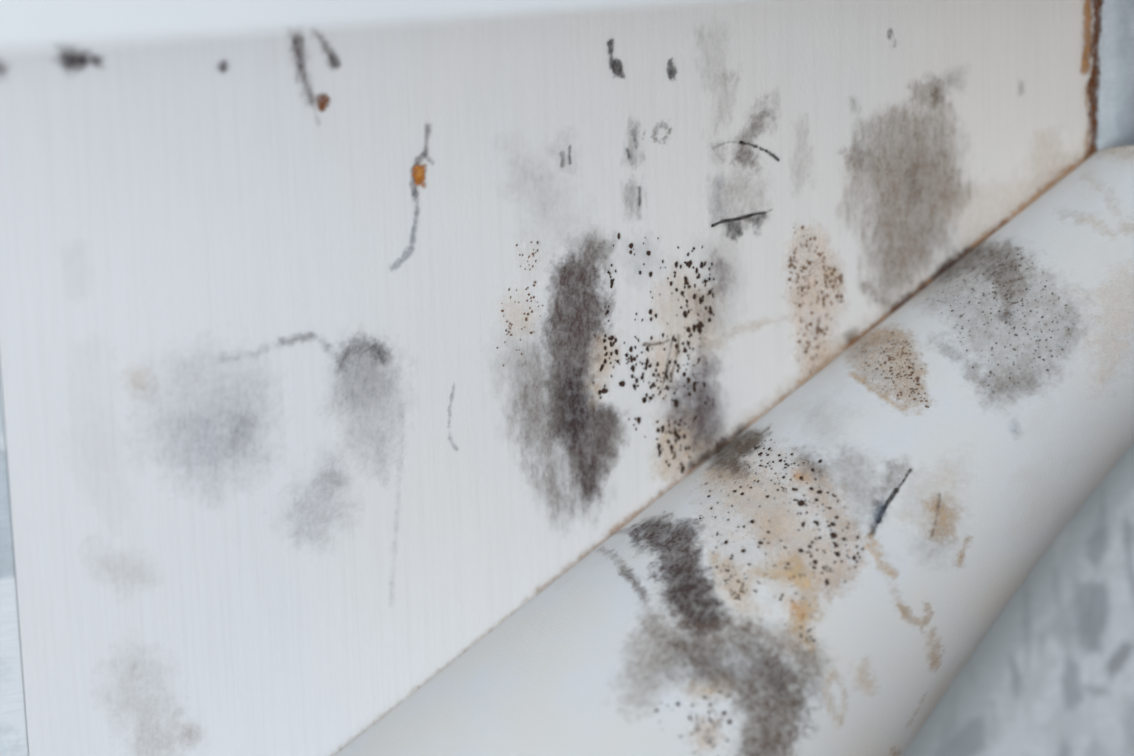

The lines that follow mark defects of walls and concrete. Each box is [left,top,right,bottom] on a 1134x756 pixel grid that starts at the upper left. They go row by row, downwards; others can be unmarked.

corrosion [317,95,329,112]
corrosion [412,165,426,187]
leakage [850,112,960,284]
leakage [849,327,929,408]
leakage [914,243,1074,393]
leakage [497,226,876,756]